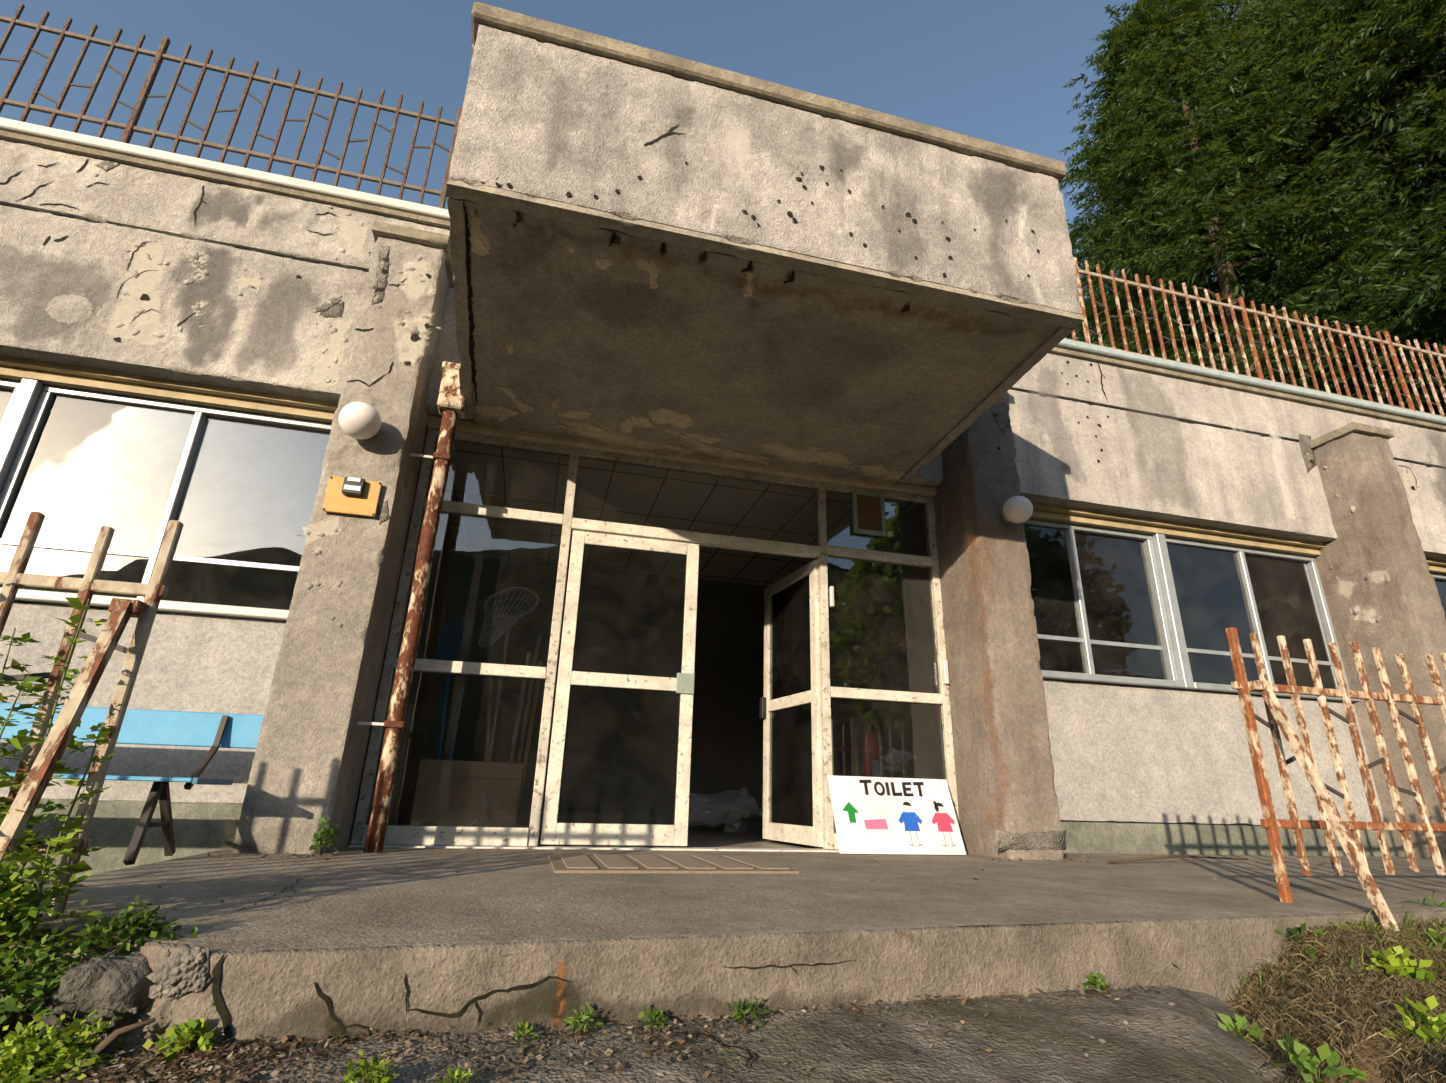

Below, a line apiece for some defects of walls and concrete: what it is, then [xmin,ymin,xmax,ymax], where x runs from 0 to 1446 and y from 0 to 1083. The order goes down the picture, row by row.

damp [192,189,261,224]
peeling [108,237,209,346]
damp [178,249,235,364]
peeling [237,269,263,296]
peeling [308,205,443,365]
crack [464,207,477,406]
peeling [473,386,926,486]
crack [314,982,372,1042]
crack [401,973,572,1029]